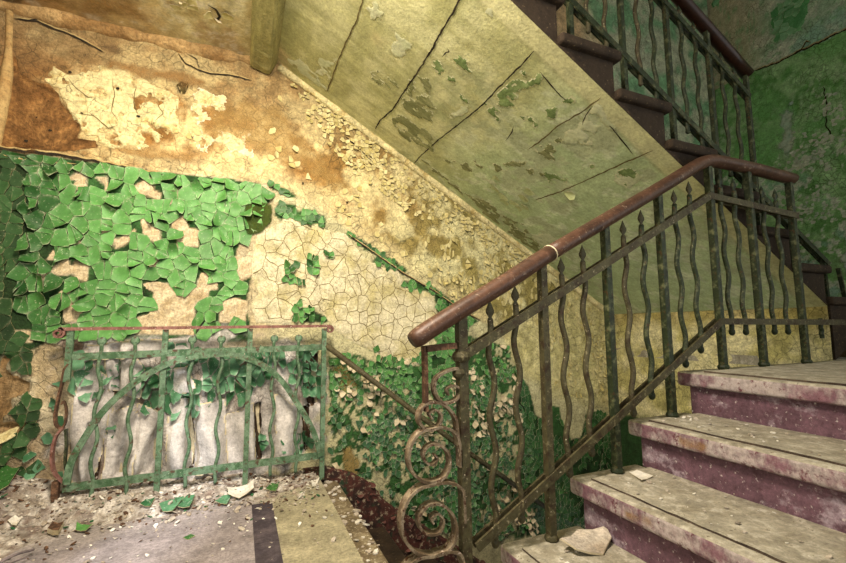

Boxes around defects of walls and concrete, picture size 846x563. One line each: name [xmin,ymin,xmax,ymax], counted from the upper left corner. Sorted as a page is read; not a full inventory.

crack [16,17,104,53]
crack [0,145,163,175]
crack [179,53,249,80]
peeling [287,58,529,312]
crack [375,0,460,129]
crack [415,51,600,162]
peeling [0,56,458,552]
crack [251,215,453,366]
peeling [496,272,537,316]
peeling [469,343,543,536]
peeling [549,293,608,463]
spalling [555,472,612,556]